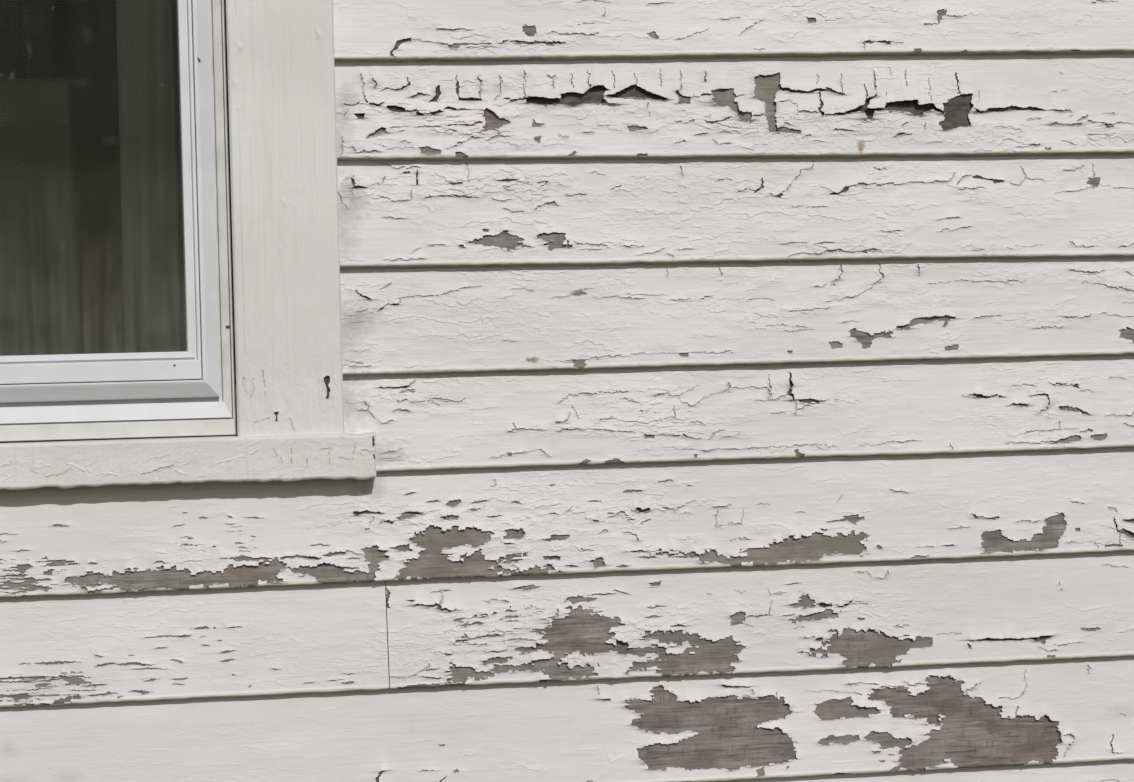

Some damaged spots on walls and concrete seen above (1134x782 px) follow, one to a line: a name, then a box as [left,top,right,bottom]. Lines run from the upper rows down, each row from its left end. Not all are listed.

peeling [337,64,979,220]
crack [424,161,622,213]
crack [718,161,1133,208]
peeling [456,225,577,252]
crack [346,244,481,325]
crack [514,230,900,328]
crack [1033,241,1134,329]
peeling [829,301,960,349]
peeling [1118,324,1134,343]
crack [508,371,839,433]
peeling [1097,507,1134,547]
peeling [0,489,1085,778]